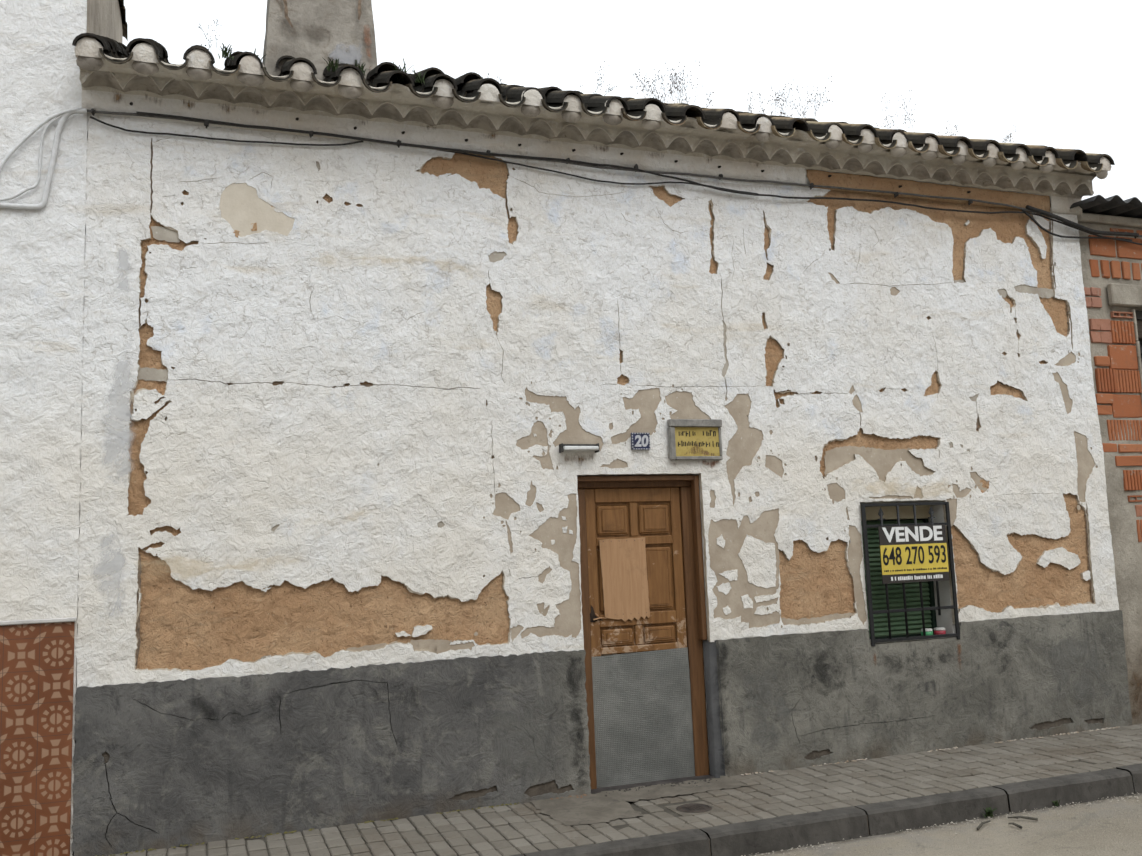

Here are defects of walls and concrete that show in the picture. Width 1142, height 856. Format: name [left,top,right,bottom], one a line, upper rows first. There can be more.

flaking render [417,153,519,262]
flaking render [807,190,1069,336]
flaking render [127,214,199,516]
crack [184,379,478,390]
peeling [516,350,710,470]
flaking render [135,480,582,672]
peeling [708,394,969,628]
flaking render [946,431,1097,613]